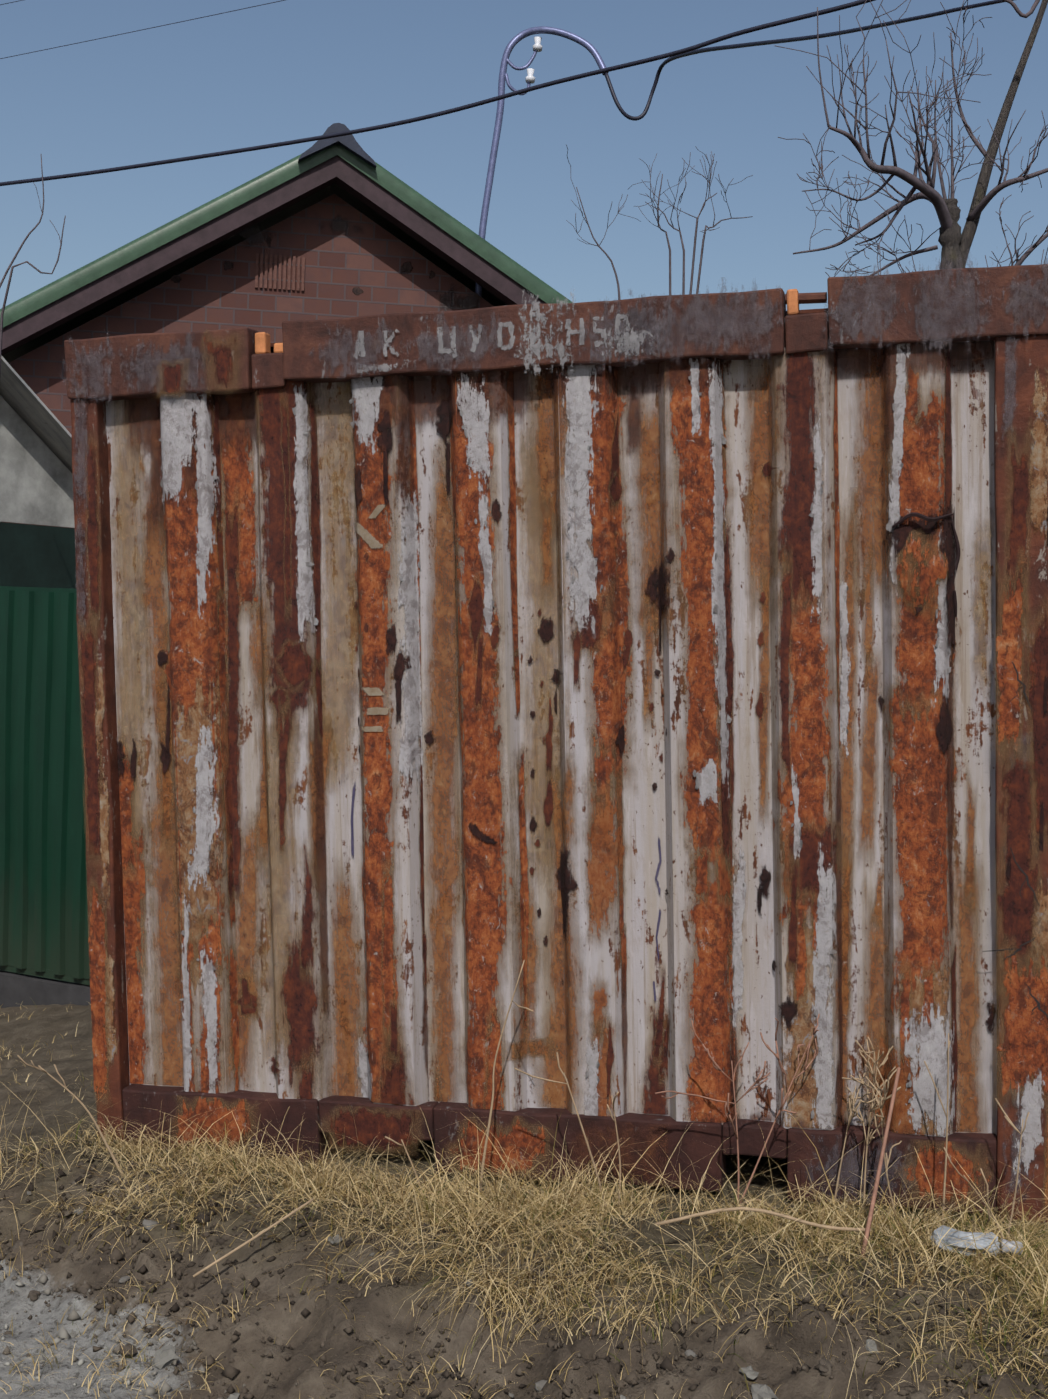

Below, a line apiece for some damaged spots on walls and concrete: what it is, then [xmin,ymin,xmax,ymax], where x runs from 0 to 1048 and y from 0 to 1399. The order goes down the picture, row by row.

rust [80,623,101,857]
rust [88,886,108,1101]
peeling [64,334,220,631]
peeling [180,715,222,1094]
peeling [292,384,319,642]
peeling [311,312,500,636]
rust [117,335,1048,1213]
peeling [514,285,783,806]
peeling [808,413,851,756]
peeling [824,250,991,596]
peeling [934,532,951,703]
peeling [1004,1068,1045,1199]